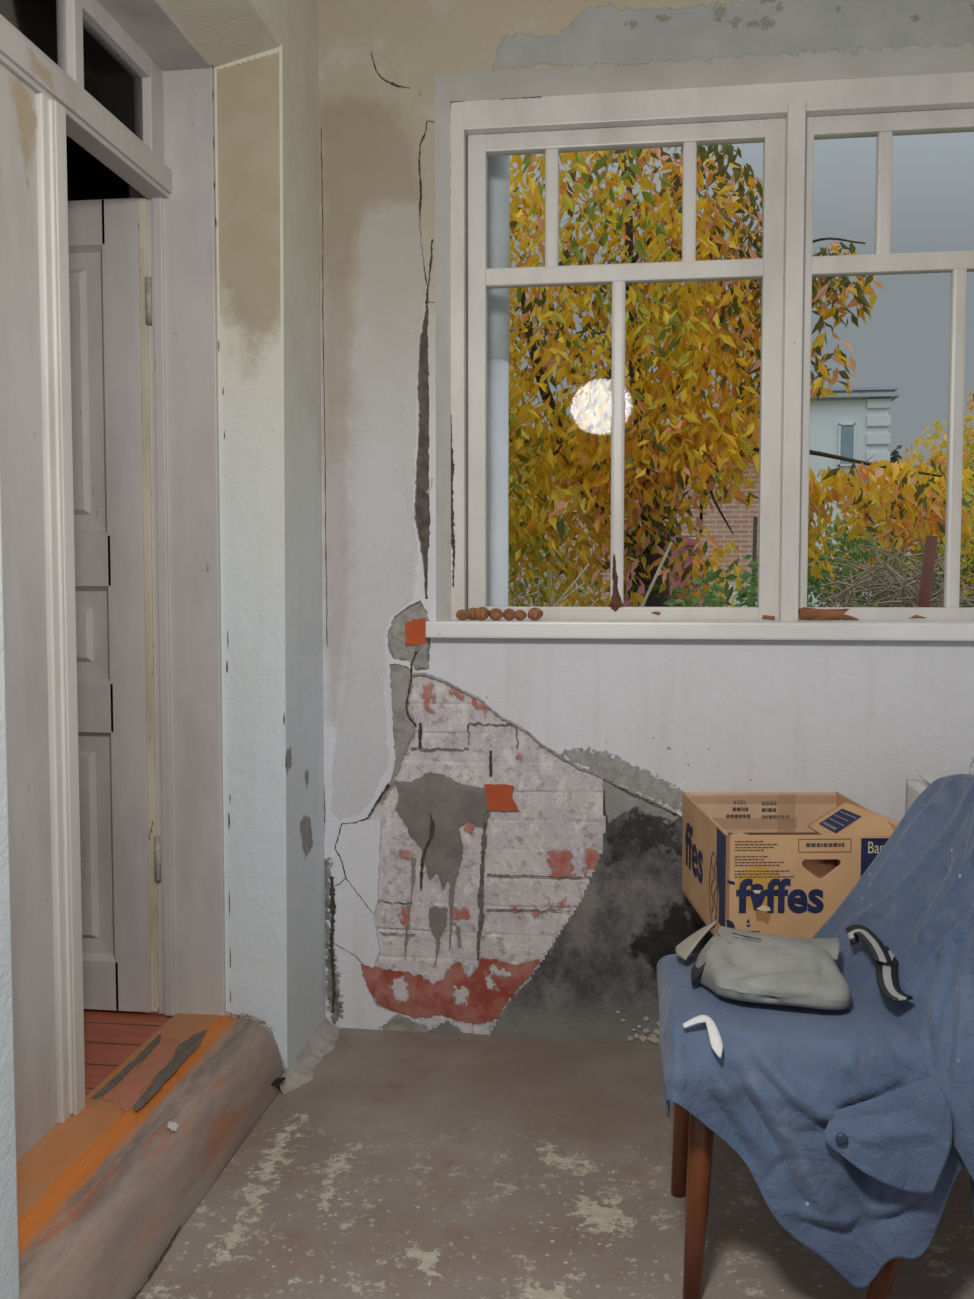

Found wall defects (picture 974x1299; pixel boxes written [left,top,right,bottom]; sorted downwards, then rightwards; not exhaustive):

crack [371,52,435,599]
crack [334,784,390,914]
spalling [361,601,677,1035]
leakage [606,807,682,865]
leakage [630,902,713,977]
spalling [616,1011,659,1043]